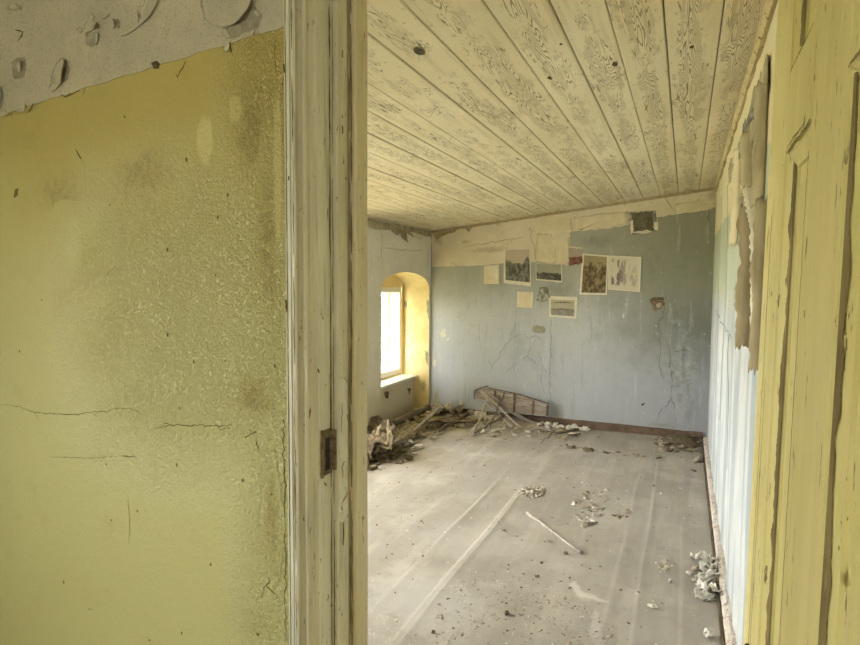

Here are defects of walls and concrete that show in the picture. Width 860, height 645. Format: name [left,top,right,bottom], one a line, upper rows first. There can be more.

spalling [74,0,157,47]
spalling [200,0,261,51]
spalling [12,57,27,79]
spalling [49,58,70,92]
spalling [650,297,665,311]
crack [656,293,688,421]
crack [1,404,258,448]